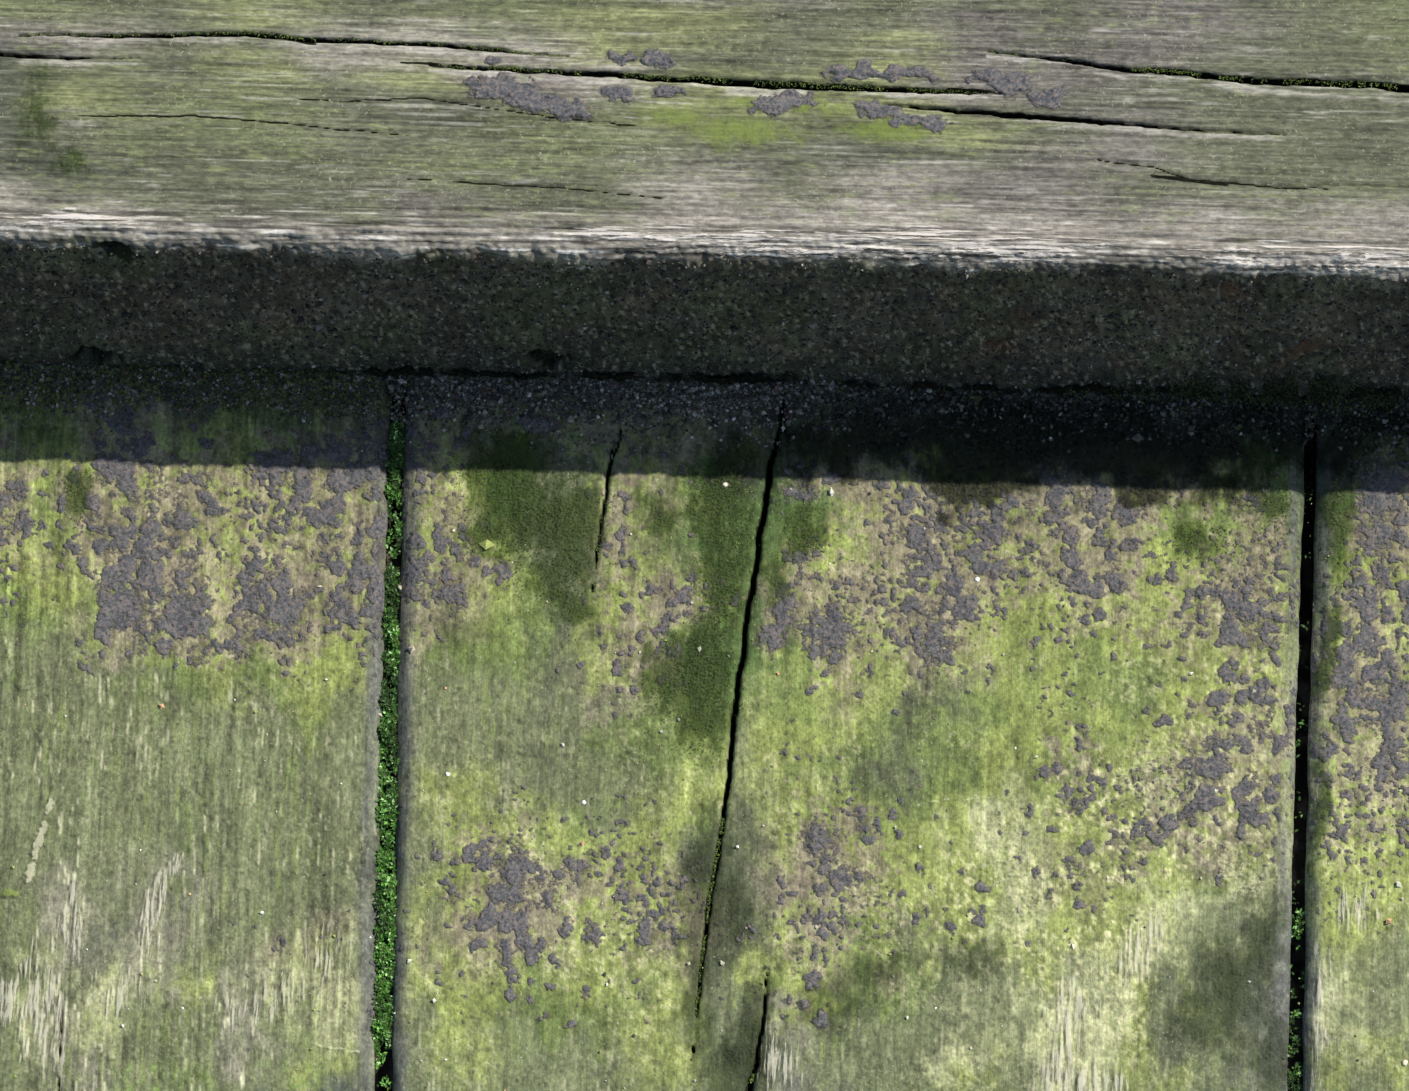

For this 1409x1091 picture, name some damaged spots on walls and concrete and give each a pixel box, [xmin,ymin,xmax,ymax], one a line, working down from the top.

crack [0,32,1328,190]
crack [996,52,1409,93]
crack [842,382,1188,395]
water stain [778,385,1409,524]
crack [338,367,799,1061]
crack [745,974,769,1091]